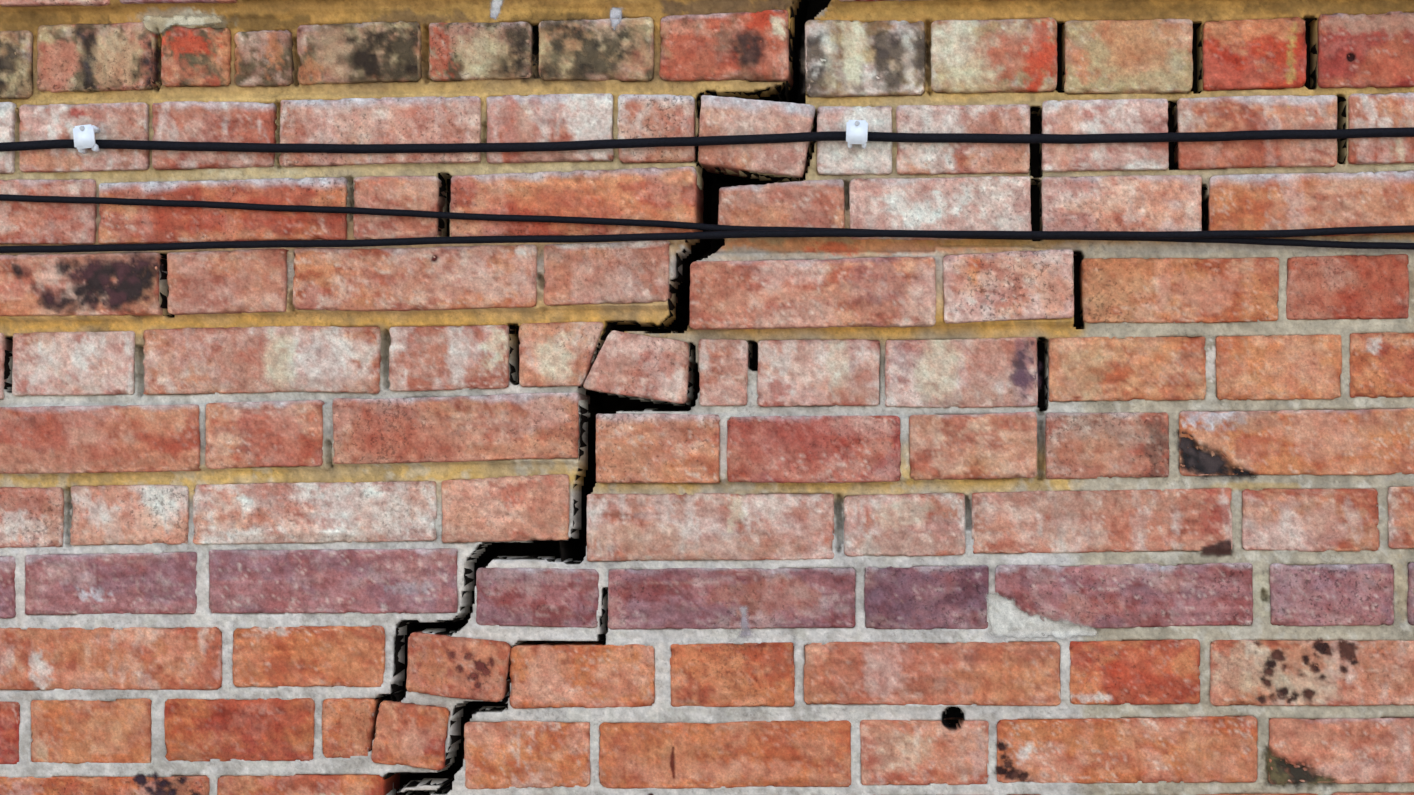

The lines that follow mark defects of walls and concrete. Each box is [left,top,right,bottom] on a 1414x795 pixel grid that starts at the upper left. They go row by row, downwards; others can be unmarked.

damp [12,252,160,310]
crack [370,0,831,795]
spalling [1178,432,1256,478]